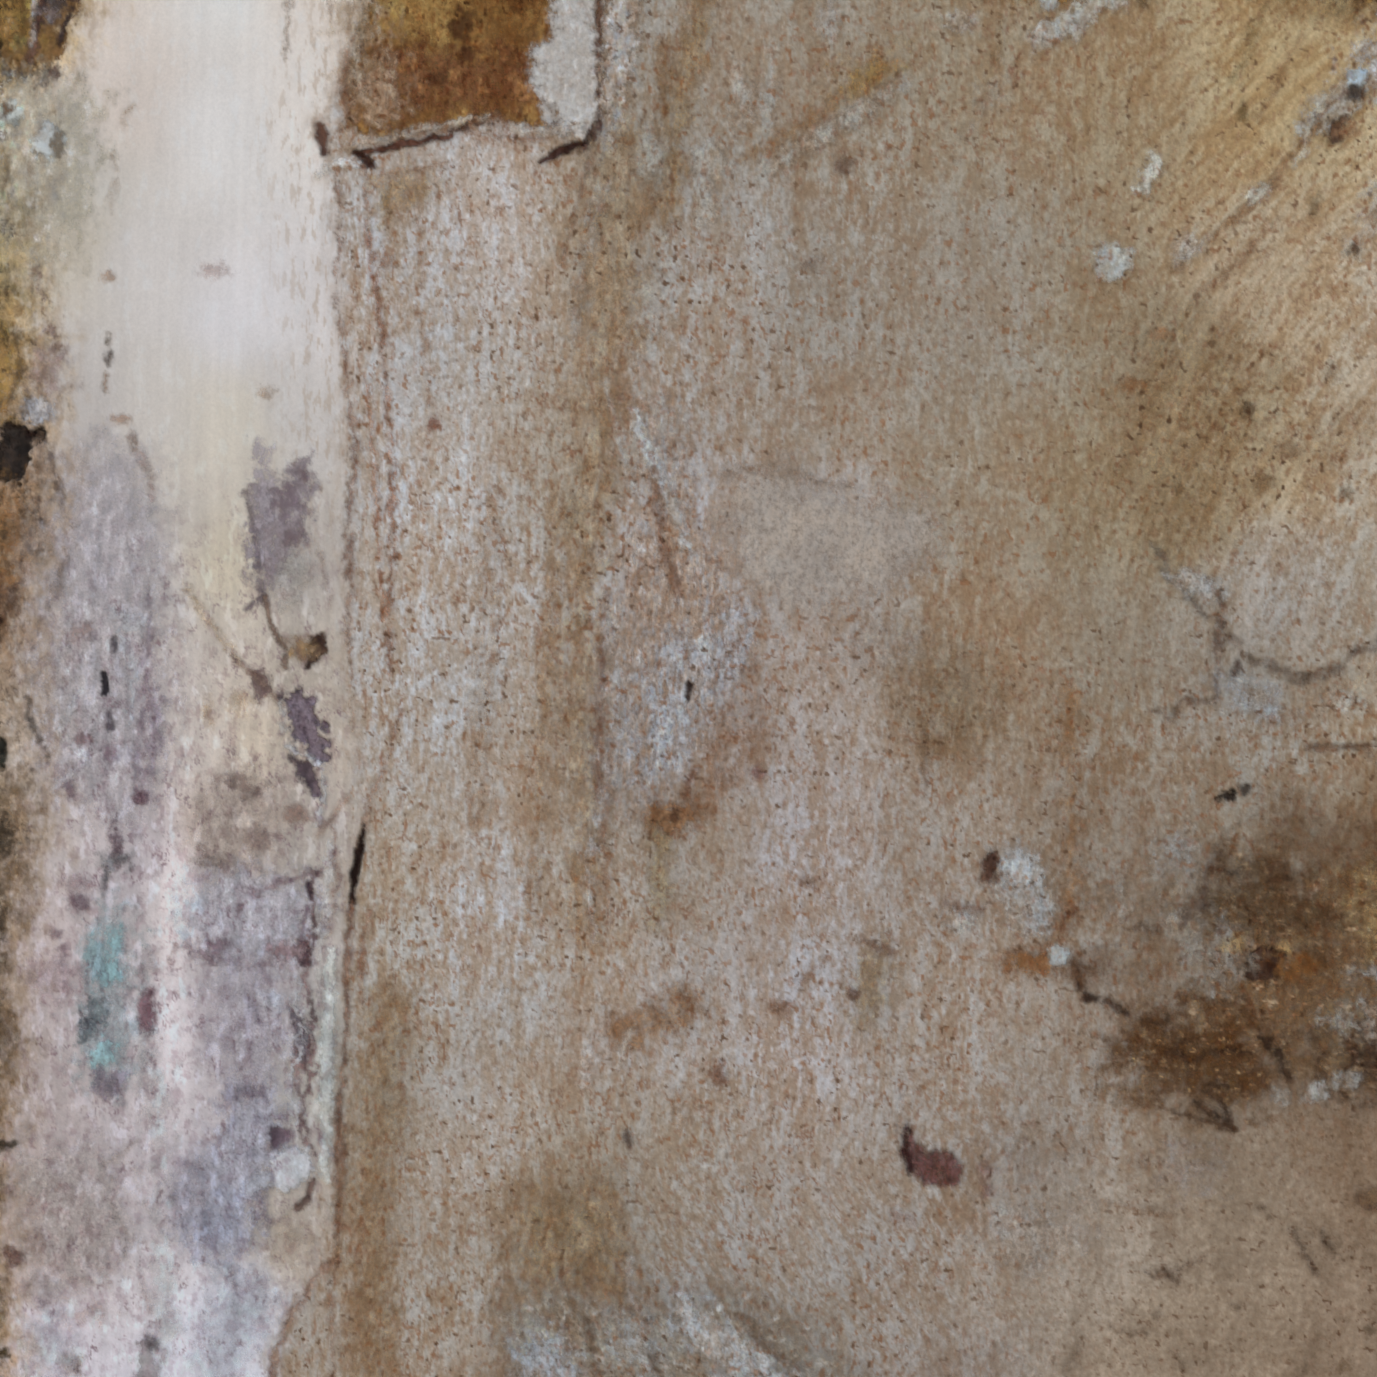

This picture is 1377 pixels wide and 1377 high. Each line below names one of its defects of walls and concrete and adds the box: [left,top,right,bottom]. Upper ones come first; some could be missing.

spalling [335,0,609,142]
crack [315,0,603,731]
peeling [0,398,184,824]
water stain [196,773,280,873]
peeling [941,840,1066,937]
spalling [1216,784,1251,802]
water stain [37,820,156,1101]
crack [329,712,402,1367]
crack [1070,943,1173,1018]
water stain [168,955,291,1315]
water stain [61,1355,81,1376]
water stain [133,1337,166,1377]